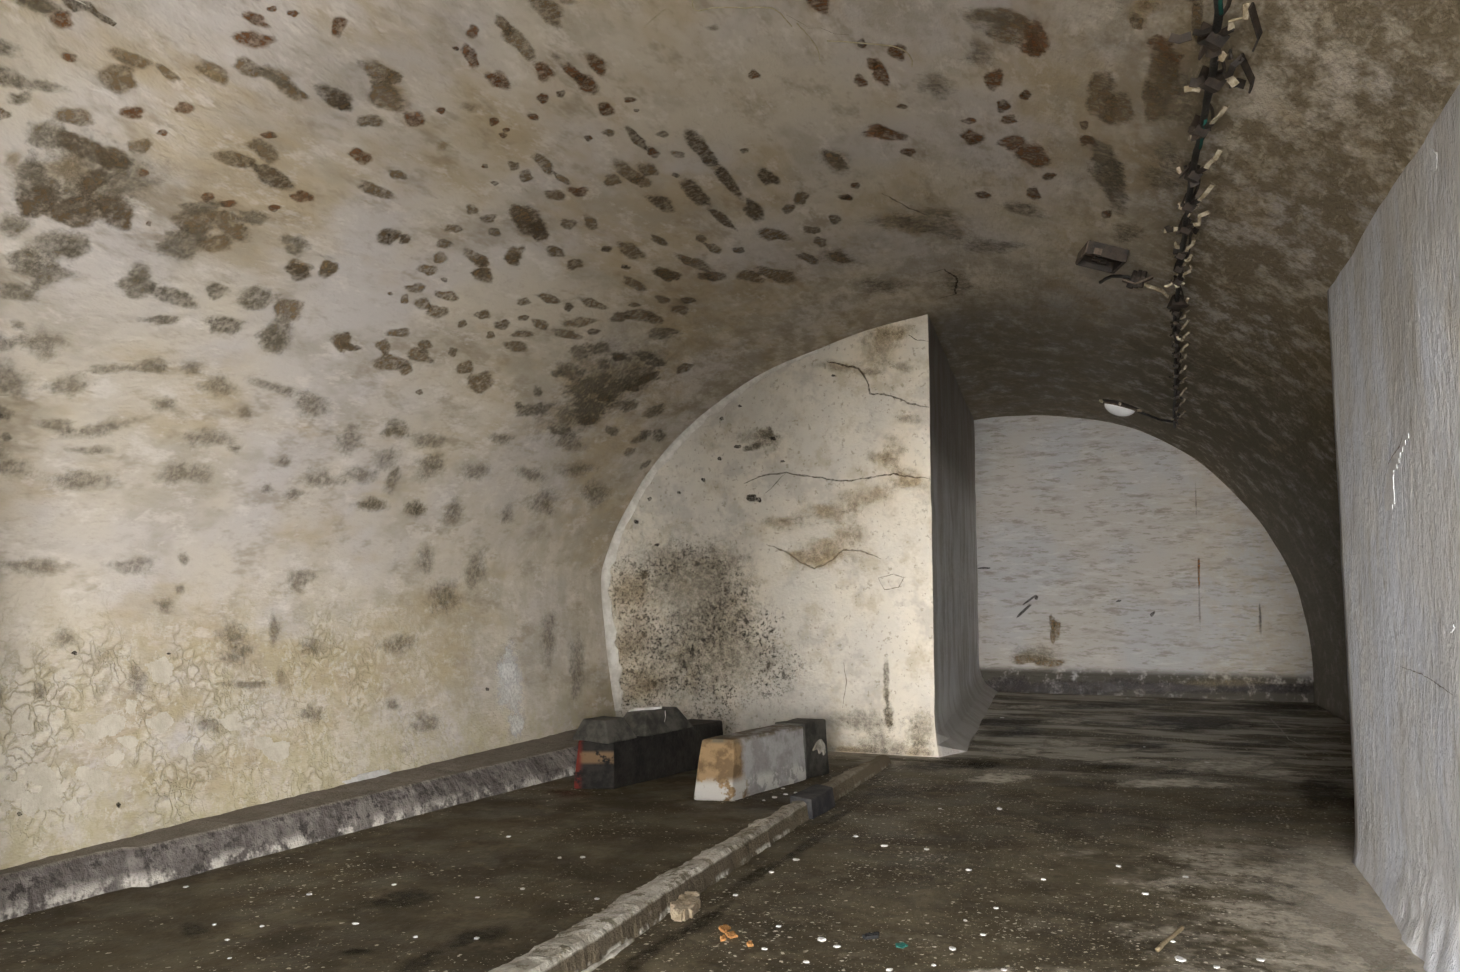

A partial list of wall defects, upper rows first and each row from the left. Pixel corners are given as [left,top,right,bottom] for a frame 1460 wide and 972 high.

water stain [196,58,308,99]
water stain [1,109,155,300]
water stain [603,127,787,240]
water stain [283,236,338,281]
water stain [120,264,224,324]
water stain [208,287,303,352]
water stain [387,154,851,474]
water stain [333,328,491,393]
crack [829,362,927,407]
crack [746,472,922,492]
crack [768,545,903,590]
water stain [609,544,799,732]